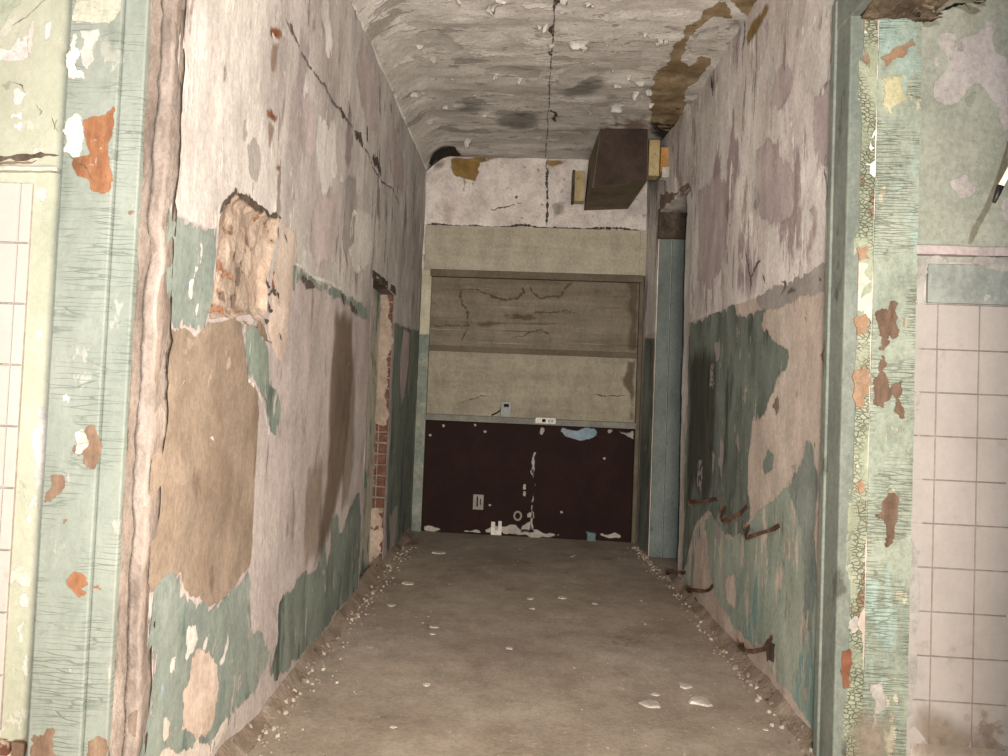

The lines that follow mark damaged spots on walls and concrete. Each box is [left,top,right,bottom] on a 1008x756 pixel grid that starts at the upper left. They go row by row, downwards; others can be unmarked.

crack [0,152,62,174]
peeling [63,107,115,194]
peeling [65,0,121,79]
crack [286,19,398,201]
crack [427,0,641,231]
leakage [651,122,675,141]
peeling [934,21,1008,164]
spalling [87,0,418,756]
crack [435,282,576,342]
peeling [852,301,921,419]
peeling [682,261,826,731]
peeling [0,728,55,756]